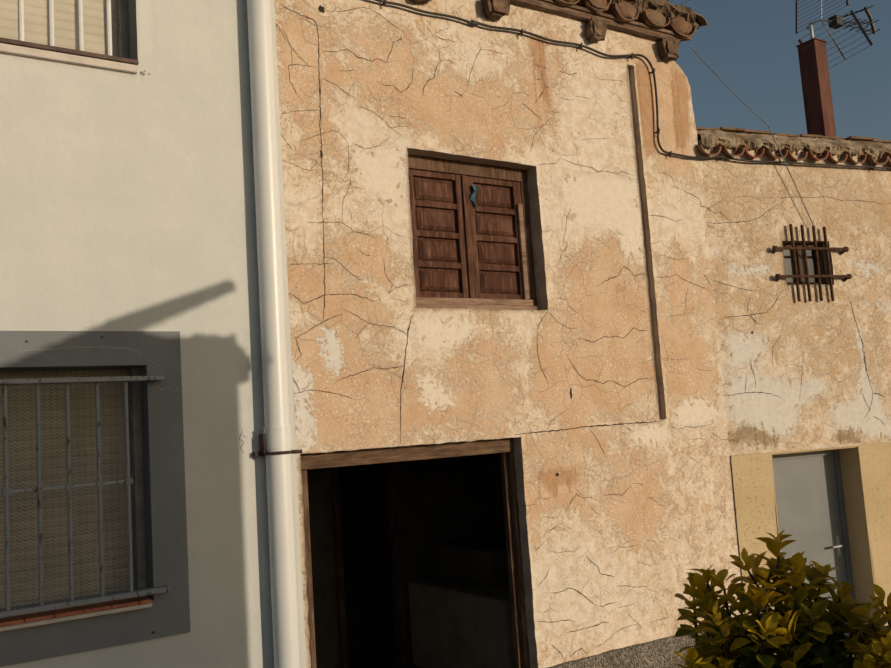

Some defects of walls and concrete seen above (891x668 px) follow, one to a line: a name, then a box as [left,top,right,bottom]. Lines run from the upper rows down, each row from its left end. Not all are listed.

crack [275,5,506,444]
crack [597,255,782,322]
flaking render [292,323,351,451]
flaking render [415,366,457,415]
flaking render [410,310,480,357]
crack [537,298,650,379]
crack [570,361,649,387]
flaking render [626,324,891,451]
crack [723,359,803,399]
crack [848,298,884,423]
crack [514,411,742,452]
crack [526,475,670,660]